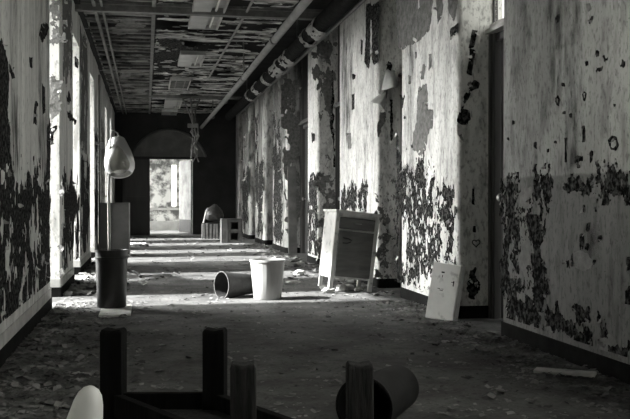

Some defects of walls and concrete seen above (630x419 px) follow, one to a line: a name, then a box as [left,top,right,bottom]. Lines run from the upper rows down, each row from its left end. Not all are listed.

peeling [311,39,338,134]
peeling [364,1,380,68]
peeling [396,0,458,50]
peeling [457,30,481,141]
peeling [0,0,107,324]
peeling [241,109,264,237]
peeling [272,75,301,244]
peeling [296,54,458,292]
peeling [563,138,630,214]
peeling [466,267,480,300]
peeling [499,163,630,358]